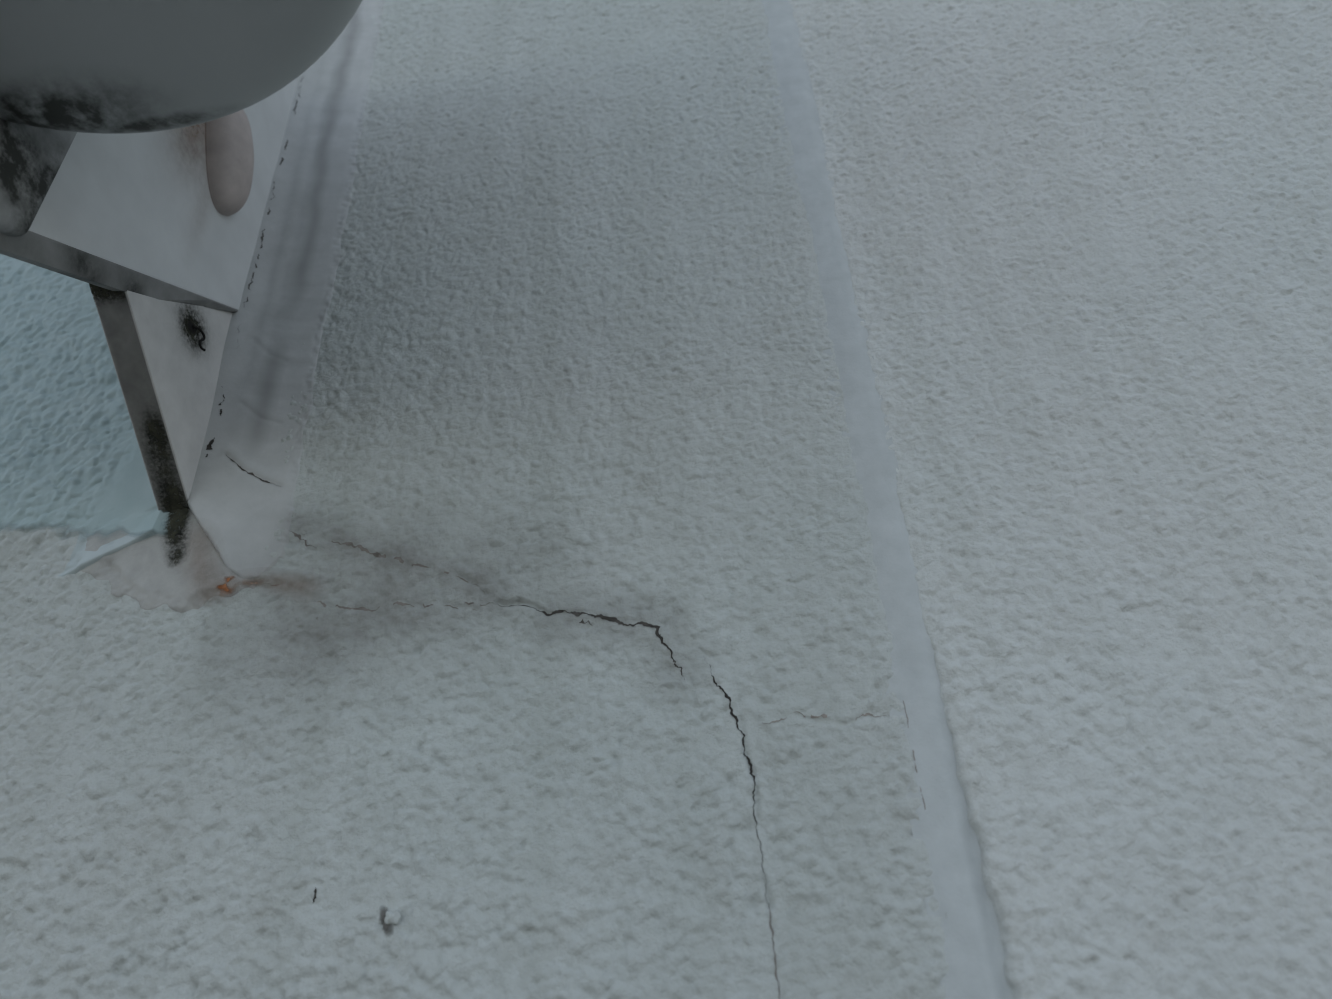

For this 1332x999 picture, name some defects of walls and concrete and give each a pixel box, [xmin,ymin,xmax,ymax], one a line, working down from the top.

crack [292,532,926,999]